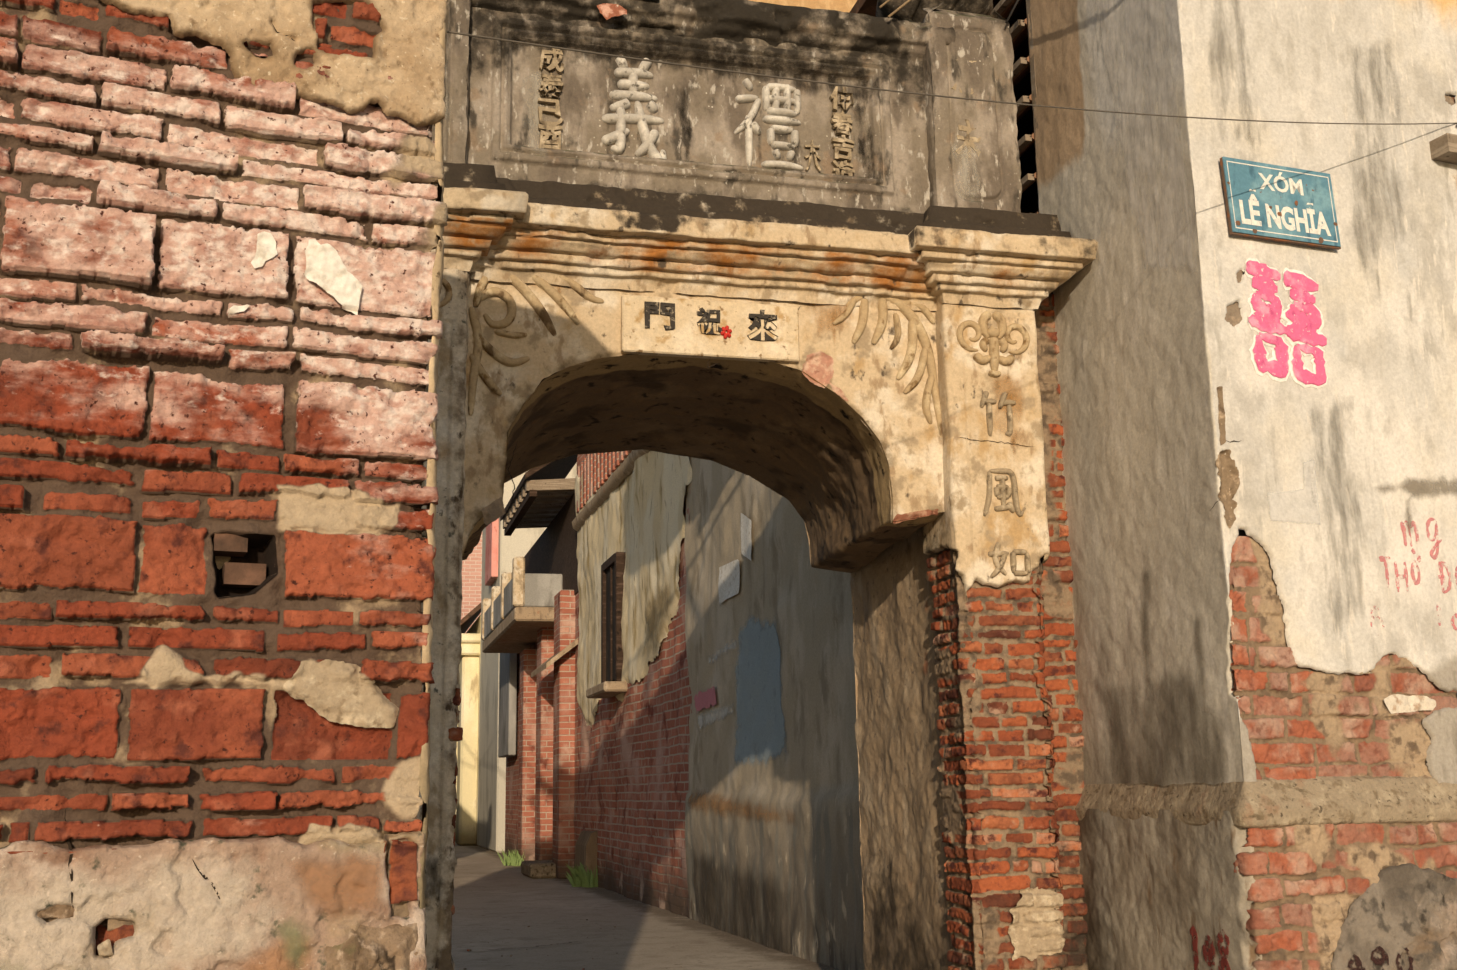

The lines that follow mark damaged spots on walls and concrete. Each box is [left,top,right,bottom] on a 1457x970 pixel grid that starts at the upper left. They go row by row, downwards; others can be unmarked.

water stain [680,90,690,157]
water stain [513,21,867,120]
flaking render [0,0,448,970]
flaking render [645,589,668,641]
flaking render [926,548,1069,970]
flaking render [1215,386,1457,780]